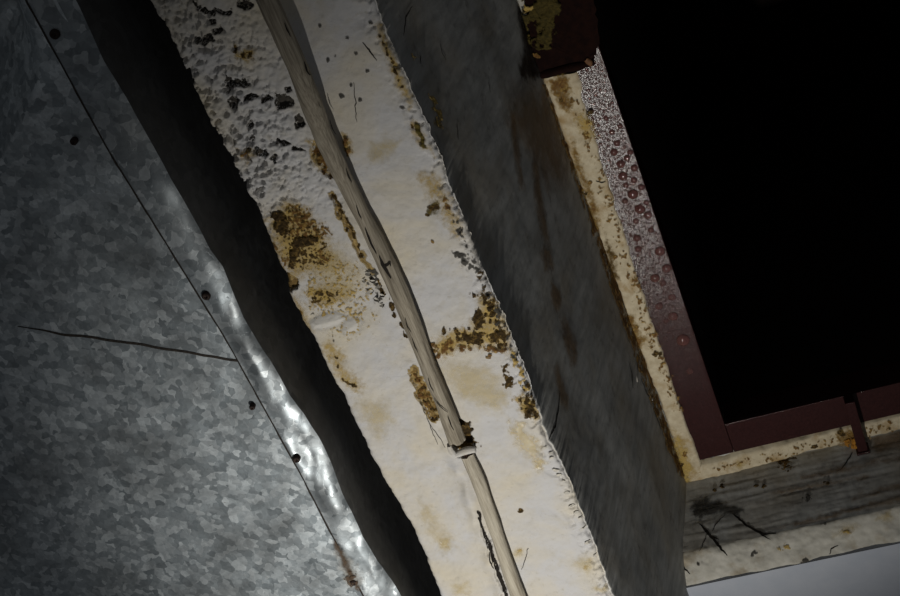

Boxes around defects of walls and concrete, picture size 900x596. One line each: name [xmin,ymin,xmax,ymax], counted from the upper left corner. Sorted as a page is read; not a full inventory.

spalling [192,0,254,46]
leakage [518,7,540,80]
spalling [224,73,305,130]
spalling [247,120,306,164]
leakage [425,201,440,216]
leakage [270,204,377,341]
rust [543,76,692,482]
leakage [431,217,543,468]
crack [699,514,776,555]